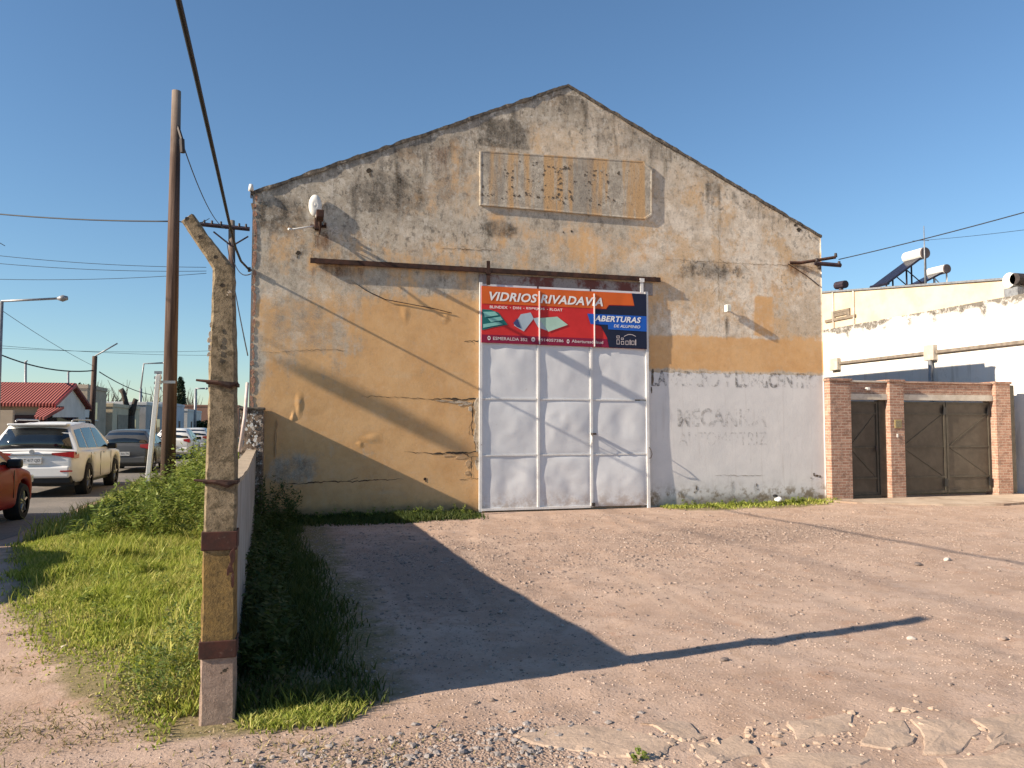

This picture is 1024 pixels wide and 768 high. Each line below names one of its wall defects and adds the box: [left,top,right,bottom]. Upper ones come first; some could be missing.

crack [369,396,479,480]
crack [283,477,400,494]